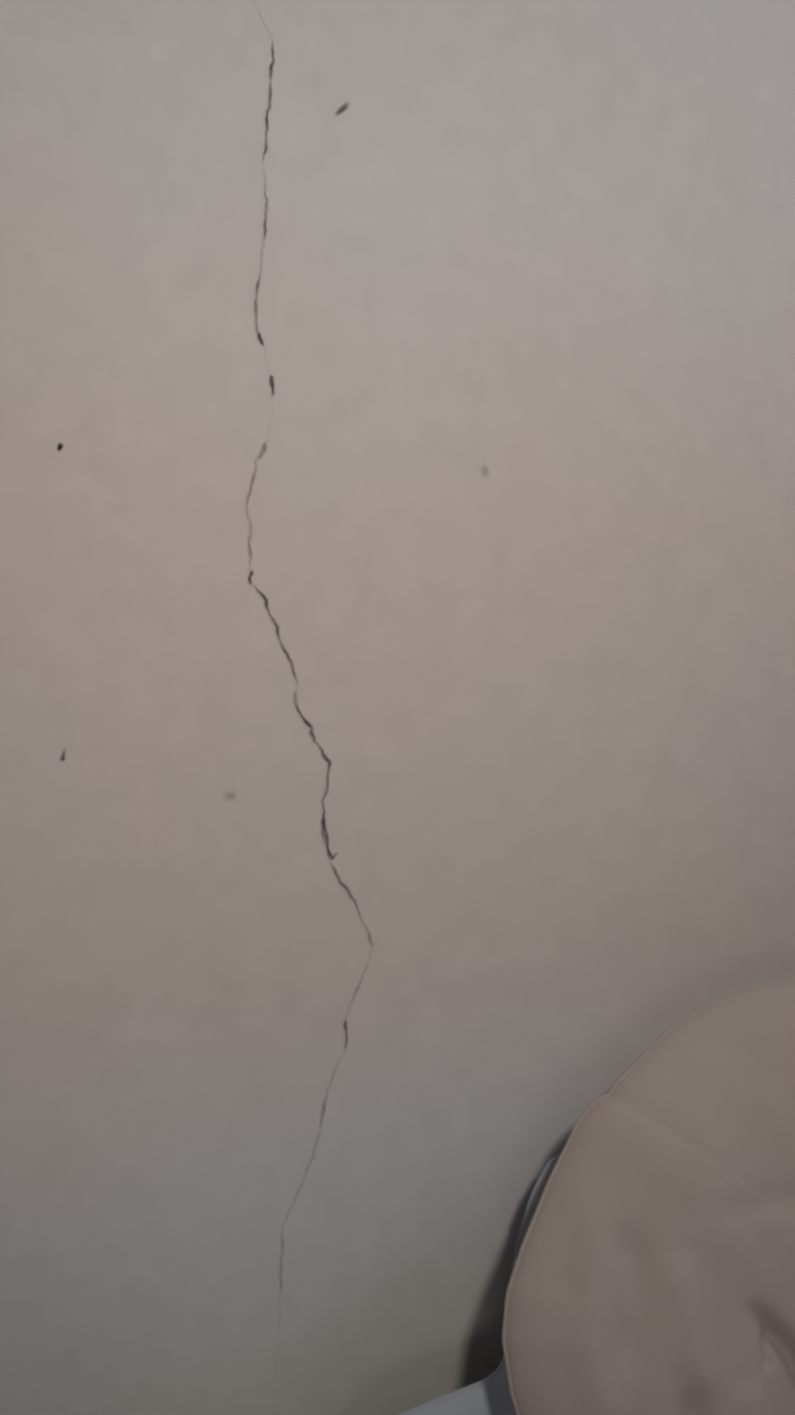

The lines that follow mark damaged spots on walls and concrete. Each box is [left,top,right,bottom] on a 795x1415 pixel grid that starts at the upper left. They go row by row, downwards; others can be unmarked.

crack [264,46,274,154]
crack [258,333,274,395]
crack [248,571,357,907]